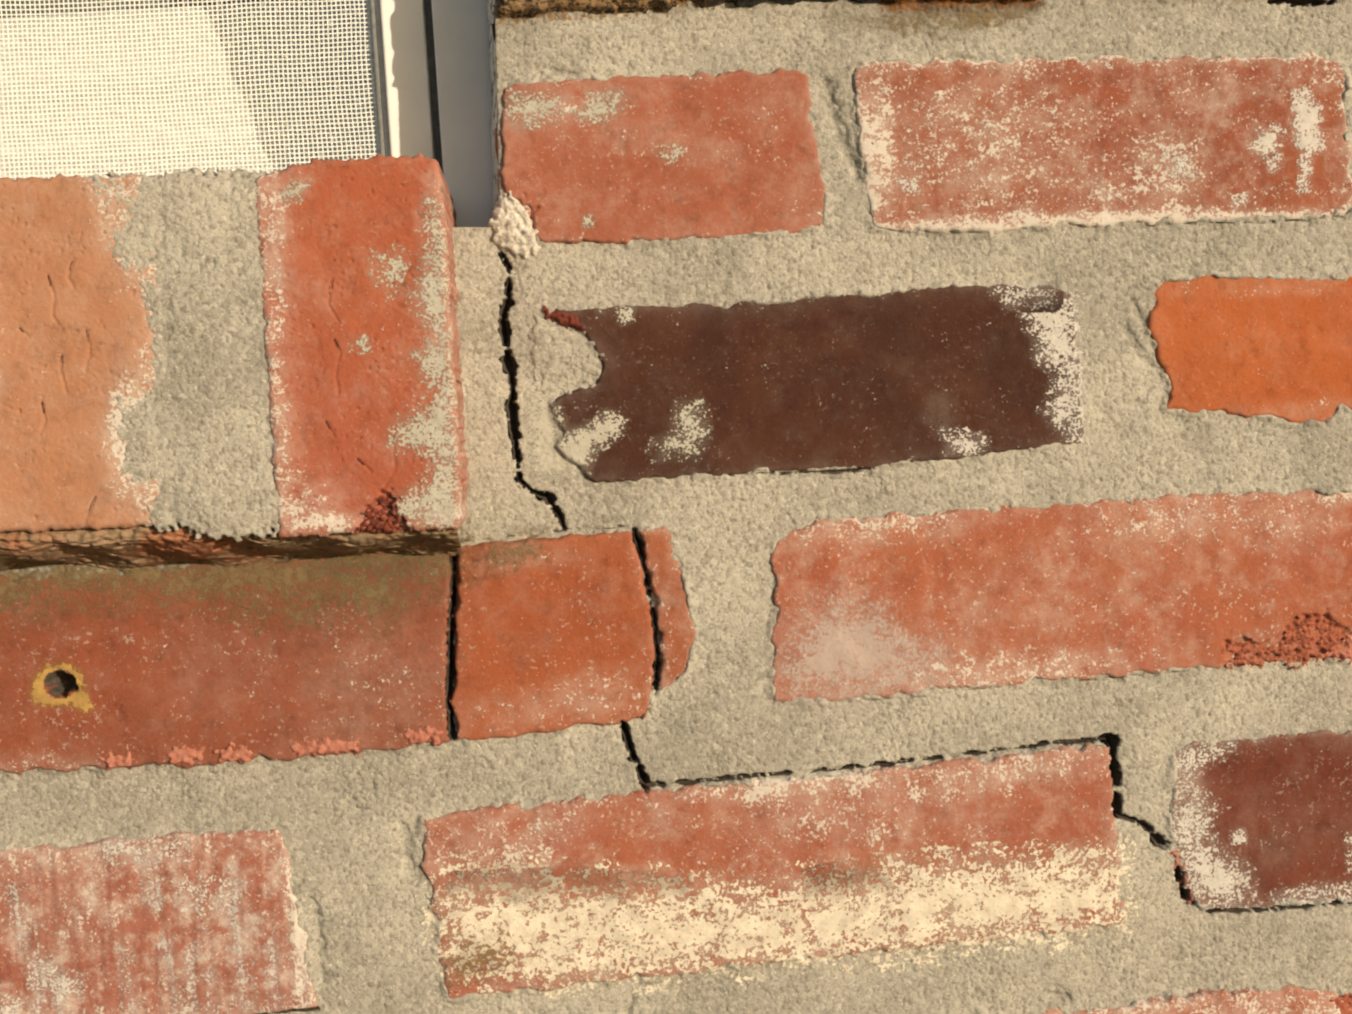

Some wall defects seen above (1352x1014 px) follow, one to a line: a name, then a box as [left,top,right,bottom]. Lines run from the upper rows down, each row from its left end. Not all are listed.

peeling [347,333,374,355]
peeling [354,188,464,534]
crack [445,251,1352,913]
spalling [1222,613,1352,670]
efflorescence [0,885,91,1014]
efflorescence [88,827,287,1014]
efflorescence [415,833,1143,1001]